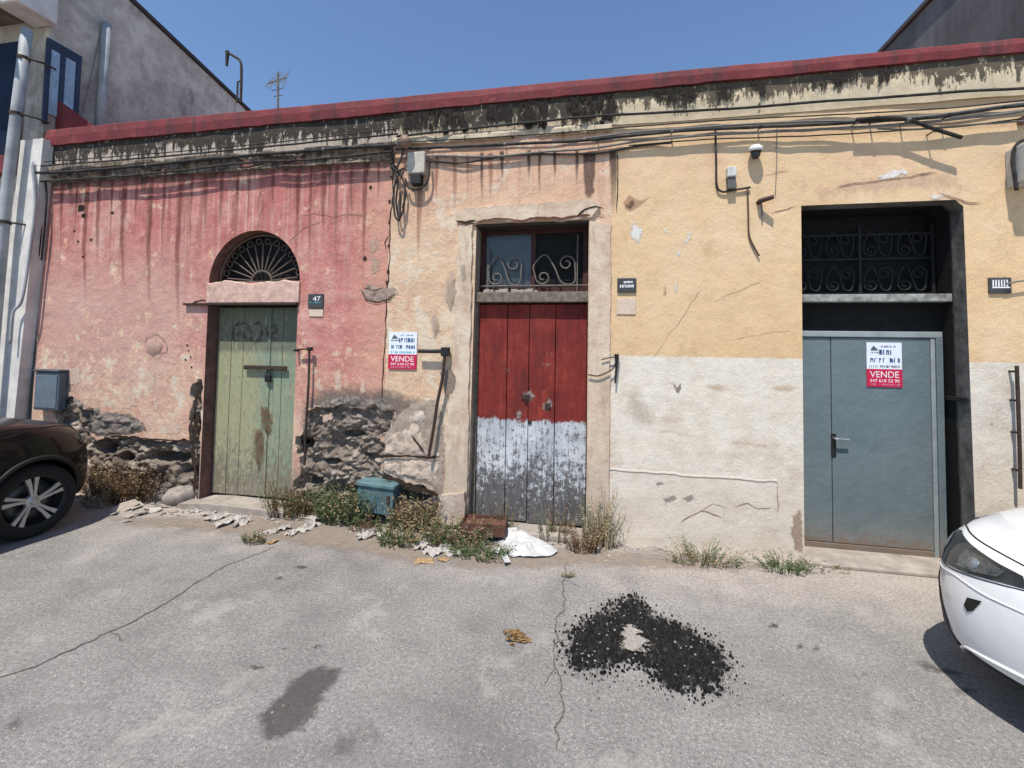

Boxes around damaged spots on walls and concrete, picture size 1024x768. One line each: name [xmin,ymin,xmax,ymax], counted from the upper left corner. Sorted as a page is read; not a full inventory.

leakage [403,106,468,135]
leakage [486,98,550,130]
leakage [642,85,699,109]
leakage [60,170,223,245]
spalling [624,195,647,243]
spalling [839,169,981,204]
spalling [53,366,203,499]
spalling [297,369,467,526]
crack [683,483,779,521]
crack [0,545,277,677]
crack [553,563,567,747]
leakage [261,667,340,738]